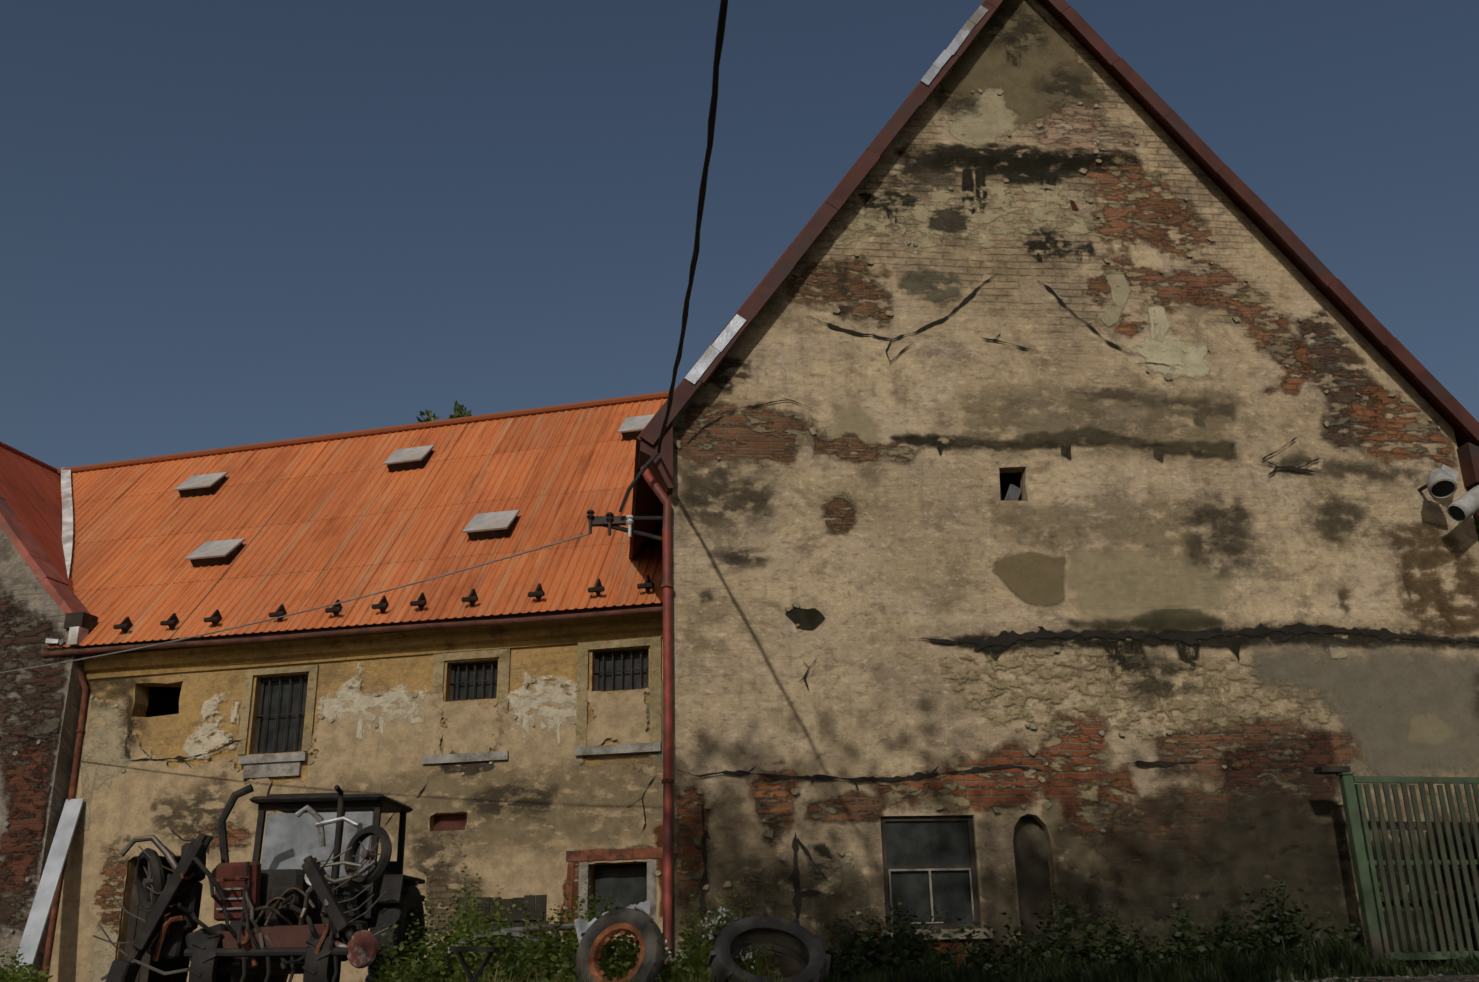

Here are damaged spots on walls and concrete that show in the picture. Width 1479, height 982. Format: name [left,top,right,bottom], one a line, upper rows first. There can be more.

crack [806,274,997,362]
crack [980,332,1033,350]
crack [1032,276,1170,366]
flaking render [786,88,1456,467]
flaking render [822,494,857,534]
spalling [785,601,825,629]
flaking render [0,588,66,933]
peeling [47,663,663,982]
flaking render [723,642,1359,939]
crack [1119,760,1197,768]